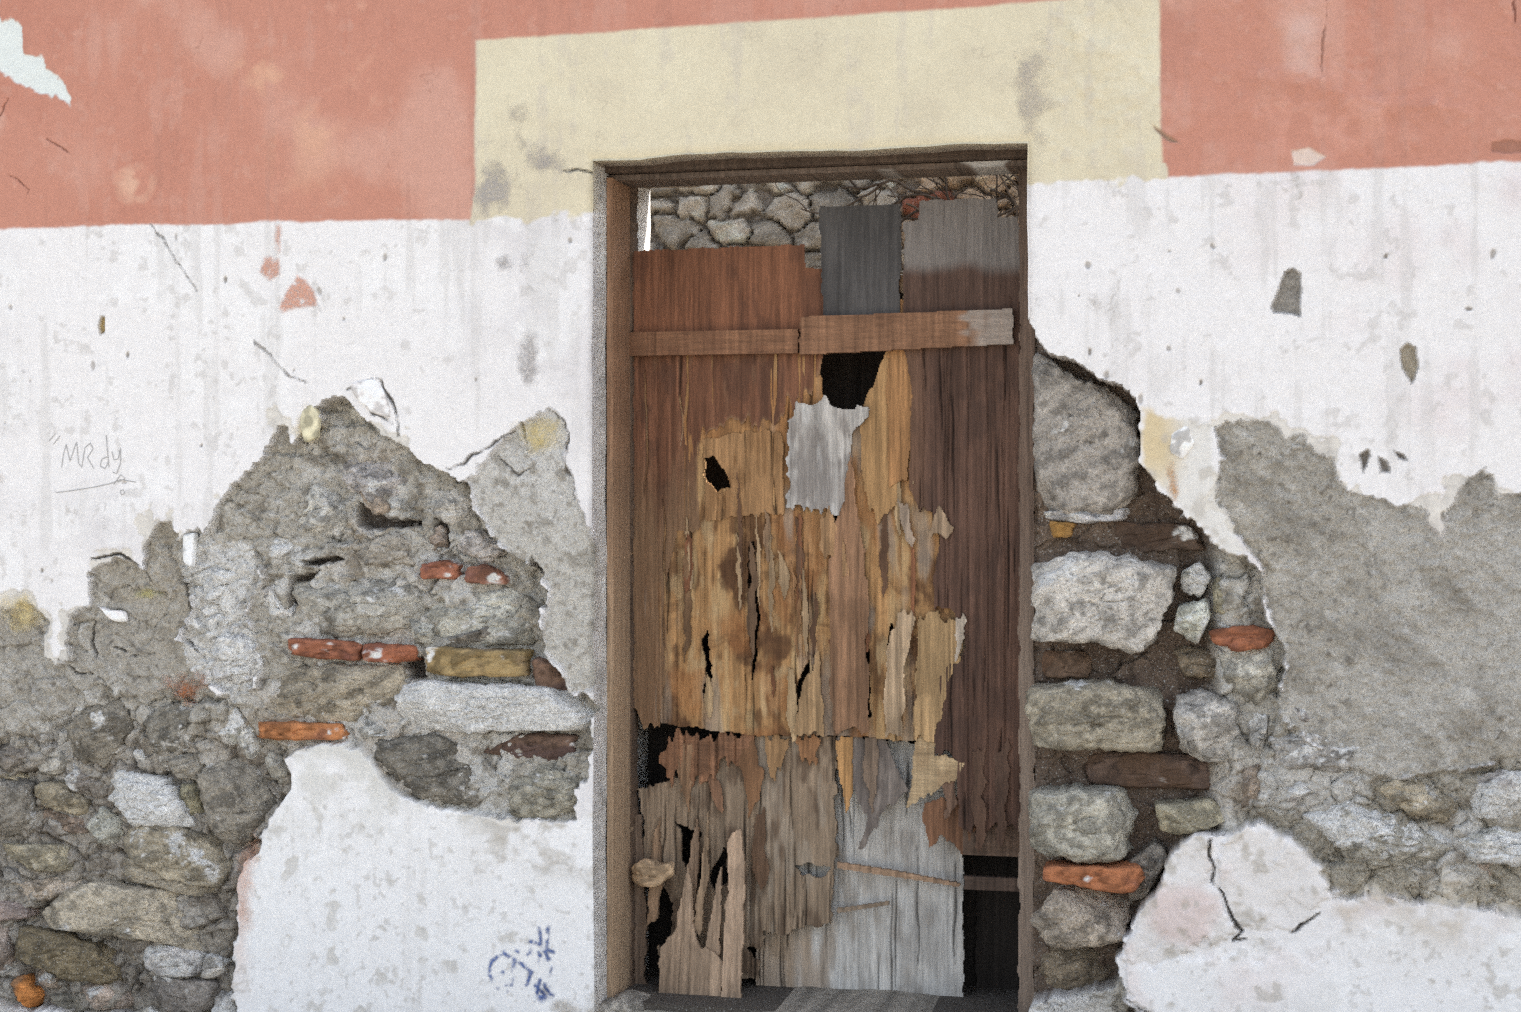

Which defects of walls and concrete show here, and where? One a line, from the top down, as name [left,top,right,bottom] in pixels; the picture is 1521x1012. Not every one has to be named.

peeling [0,0,72,109]
spalling [1270,267,1303,318]
spalling [0,380,600,1012]
spalling [1024,317,1521,1012]